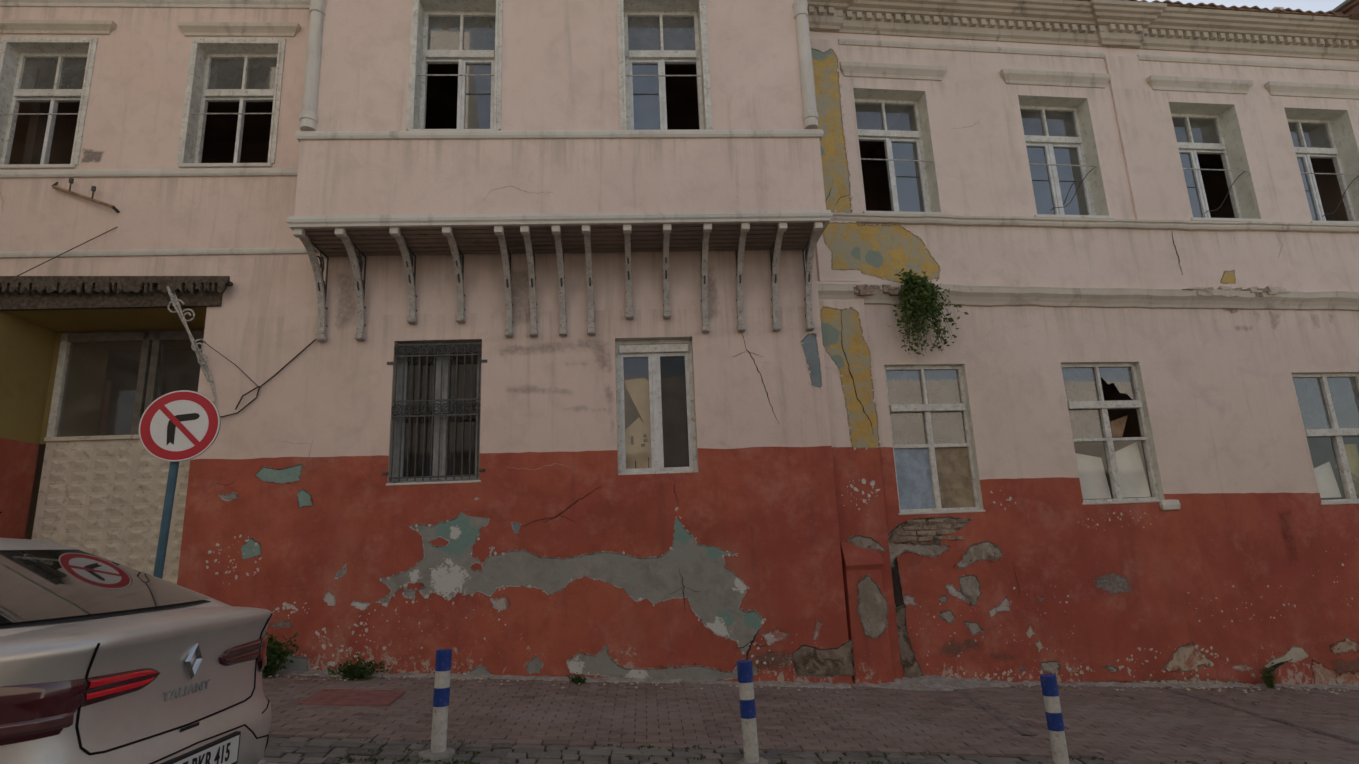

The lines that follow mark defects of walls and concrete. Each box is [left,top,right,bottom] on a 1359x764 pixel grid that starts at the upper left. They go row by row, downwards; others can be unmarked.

peeling [800,48,941,450]
crack [733,333,777,419]
peeling [255,464,314,508]
peeling [841,478,880,510]
peeling [272,601,308,628]
peeling [280,497,1015,682]
peeling [951,626,1228,682]
flaking render [1265,646,1359,686]